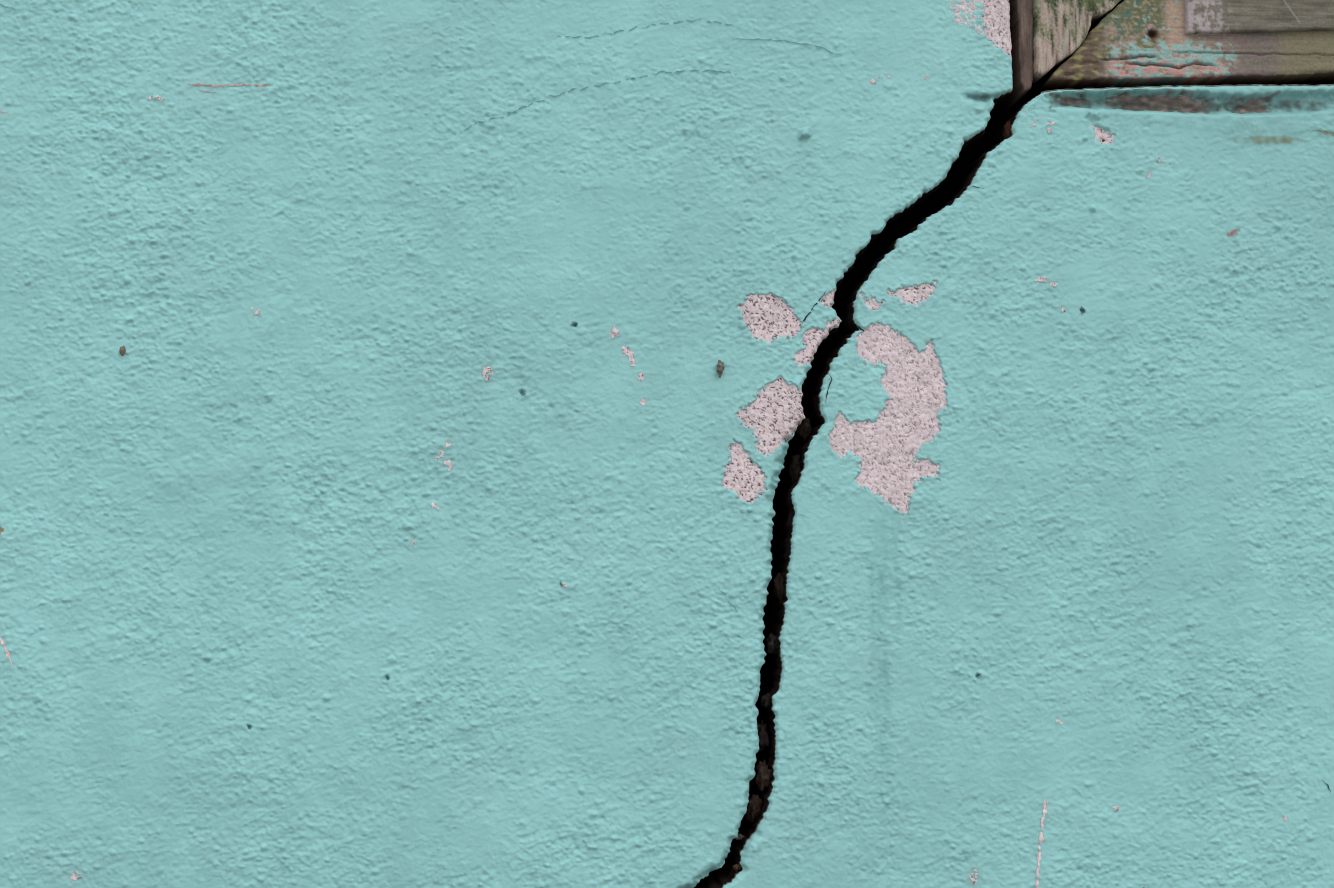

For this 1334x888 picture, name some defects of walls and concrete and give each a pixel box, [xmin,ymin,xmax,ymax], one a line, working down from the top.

crack [552,18,841,56]
peeling [948,0,1012,58]
crack [460,69,740,134]
peeling [737,289,840,369]
peeling [828,281,947,515]
peeling [722,376,805,504]
crack [693,91,1040,888]